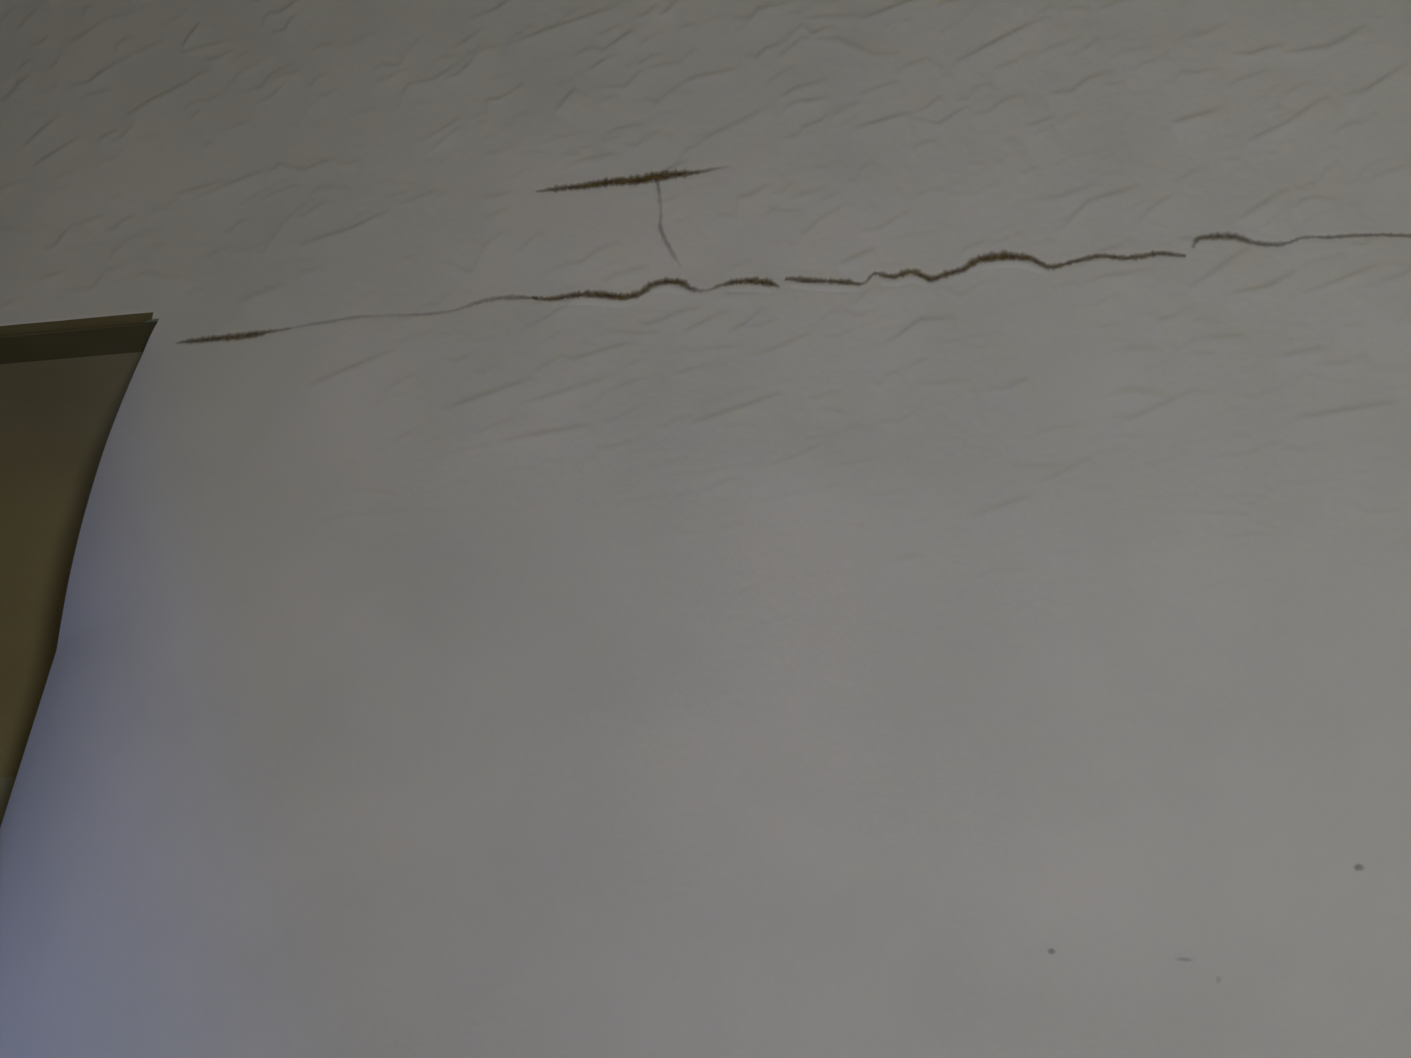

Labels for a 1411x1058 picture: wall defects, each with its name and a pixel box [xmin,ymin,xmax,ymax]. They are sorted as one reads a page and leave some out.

crack [550,171,699,191]
crack [538,234,1265,308]
crack [186,331,269,342]